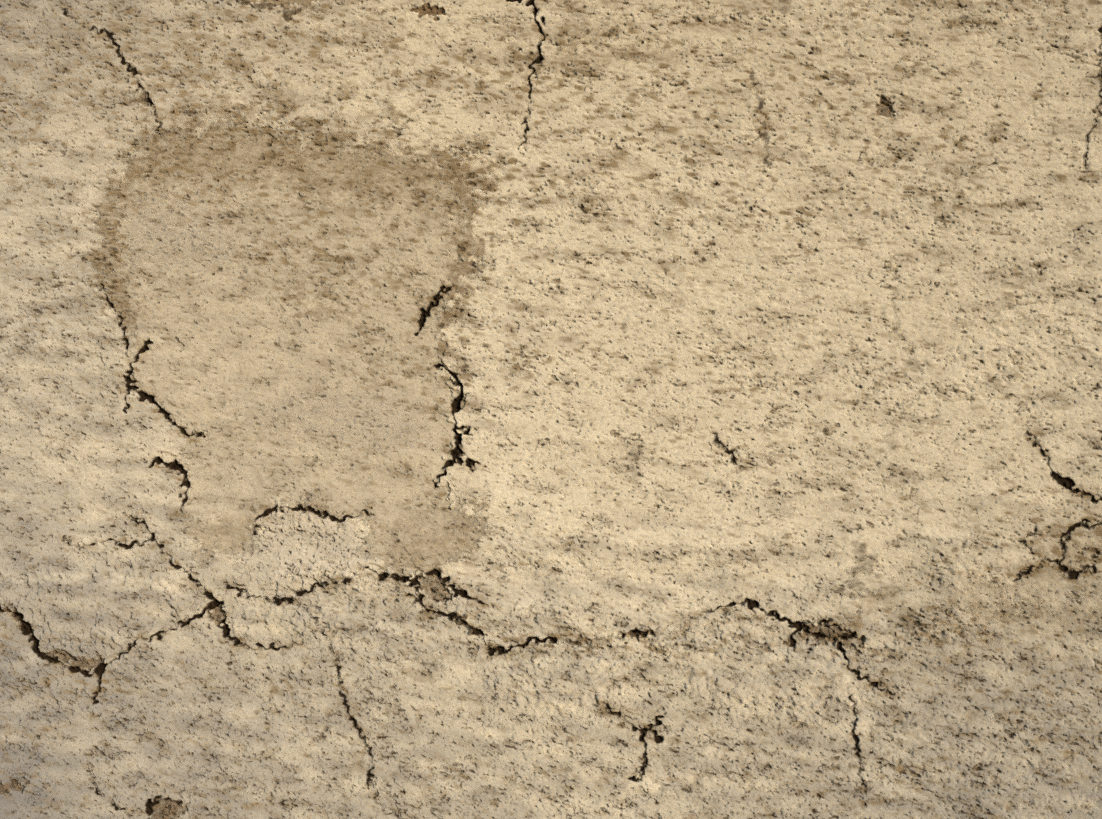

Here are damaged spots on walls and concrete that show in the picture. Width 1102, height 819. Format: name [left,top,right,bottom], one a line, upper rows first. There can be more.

crack [62,8,162,134]
crack [506,0,545,147]
crack [1085,27,1102,168]
crack [99,284,206,438]
crack [144,456,190,511]
crack [253,504,370,535]
crack [414,286,452,336]
crack [434,364,479,488]
crack [1013,432,1102,582]
crack [0,512,557,819]
crack [606,704,663,782]
crack [710,598,886,786]